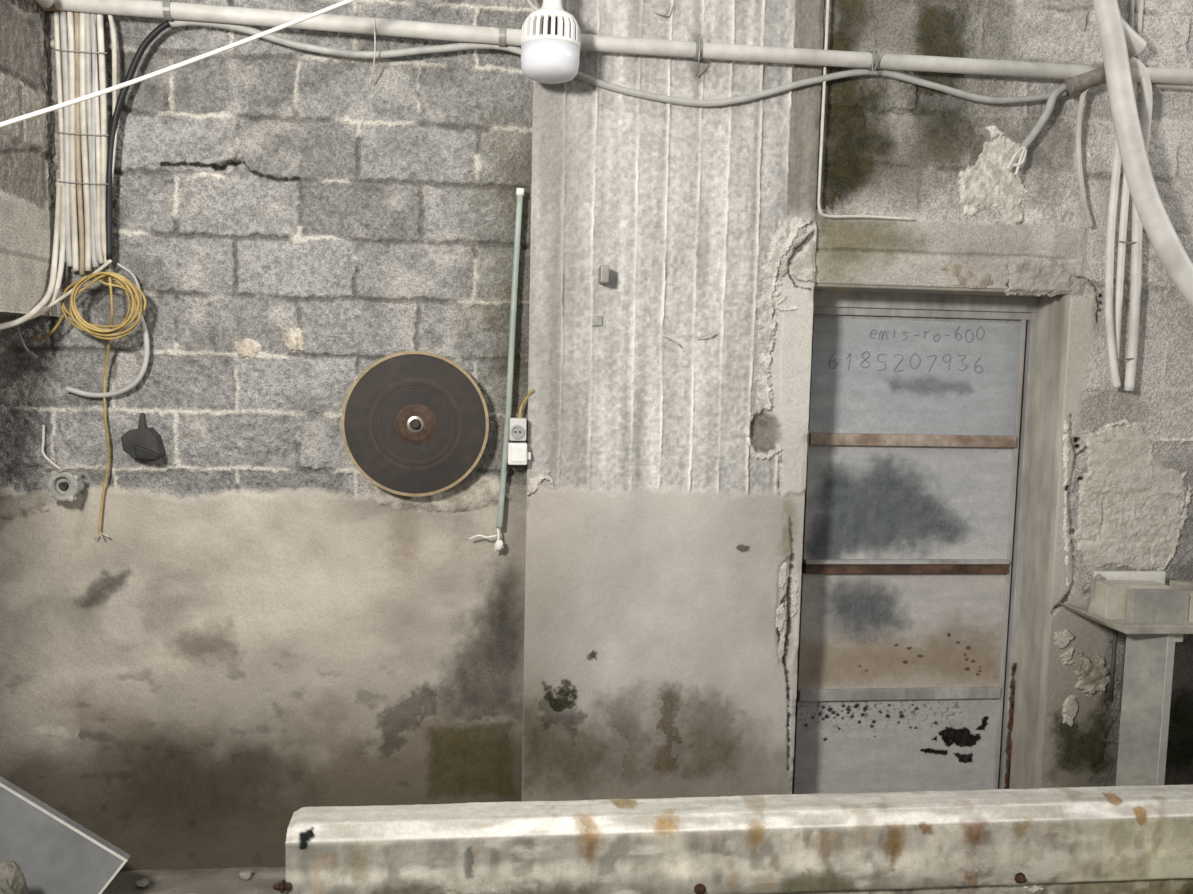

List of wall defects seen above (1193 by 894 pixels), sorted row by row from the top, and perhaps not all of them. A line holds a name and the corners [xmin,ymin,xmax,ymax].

peeling [958,125,1028,226]
spalling [743,215,816,496]
crack [1051,415,1096,613]
leakage [543,681,577,712]
crack [775,521,798,771]
corrosion [887,828,900,869]
corrosion [1103,793,1122,805]
corrosion [1134,806,1147,825]